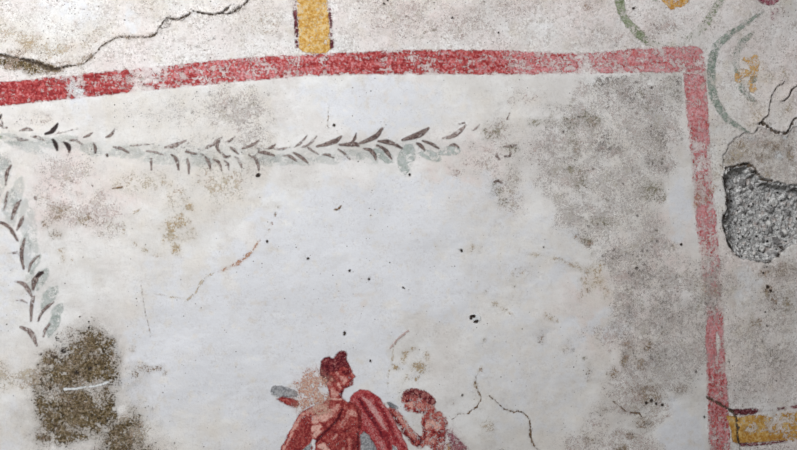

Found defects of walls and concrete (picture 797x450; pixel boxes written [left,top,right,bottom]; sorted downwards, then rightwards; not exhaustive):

crack [0,0,249,72]
flaking render [722,100,797,184]
crack [759,81,797,135]
water stain [31,316,166,450]
crack [453,381,535,446]
crack [706,397,740,449]